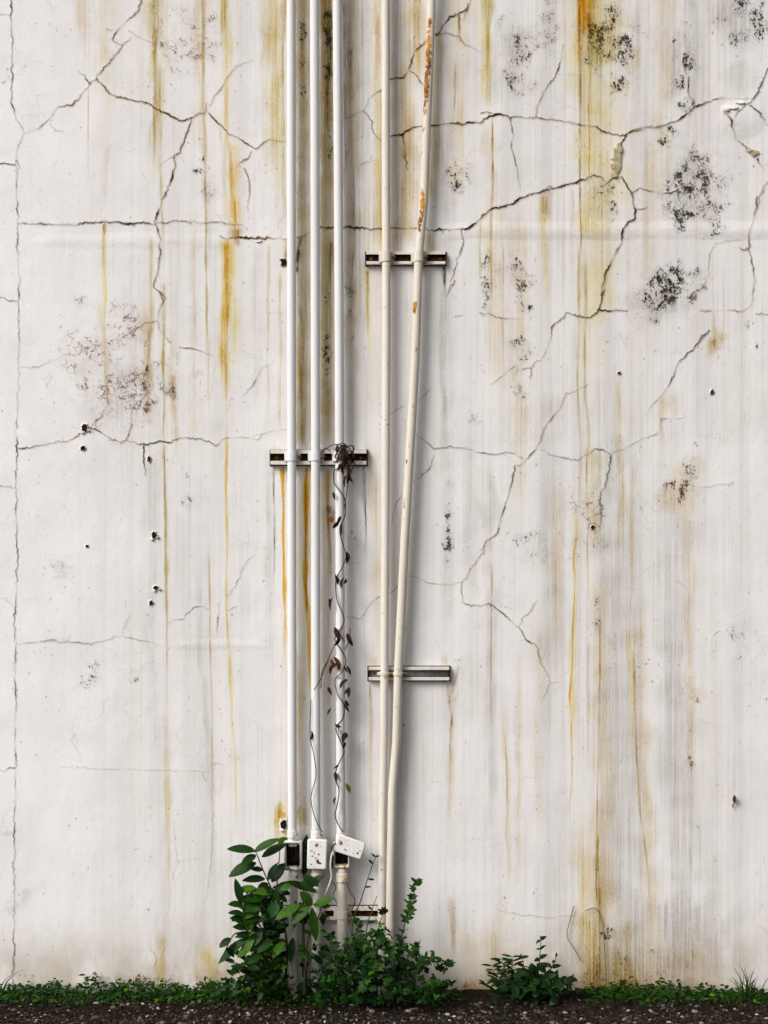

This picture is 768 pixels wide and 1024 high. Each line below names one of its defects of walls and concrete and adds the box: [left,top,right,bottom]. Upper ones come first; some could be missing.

crack [351,4,768,169]
water stain [579,4,634,92]
water stain [729,0,765,47]
crack [0,0,271,351]
water stain [663,144,732,239]
crack [296,174,678,375]
water stain [633,261,707,323]
crack [734,235,768,315]
water stain [68,302,178,431]
crack [421,290,710,674]
water stain [663,463,697,503]
crack [13,410,262,701]